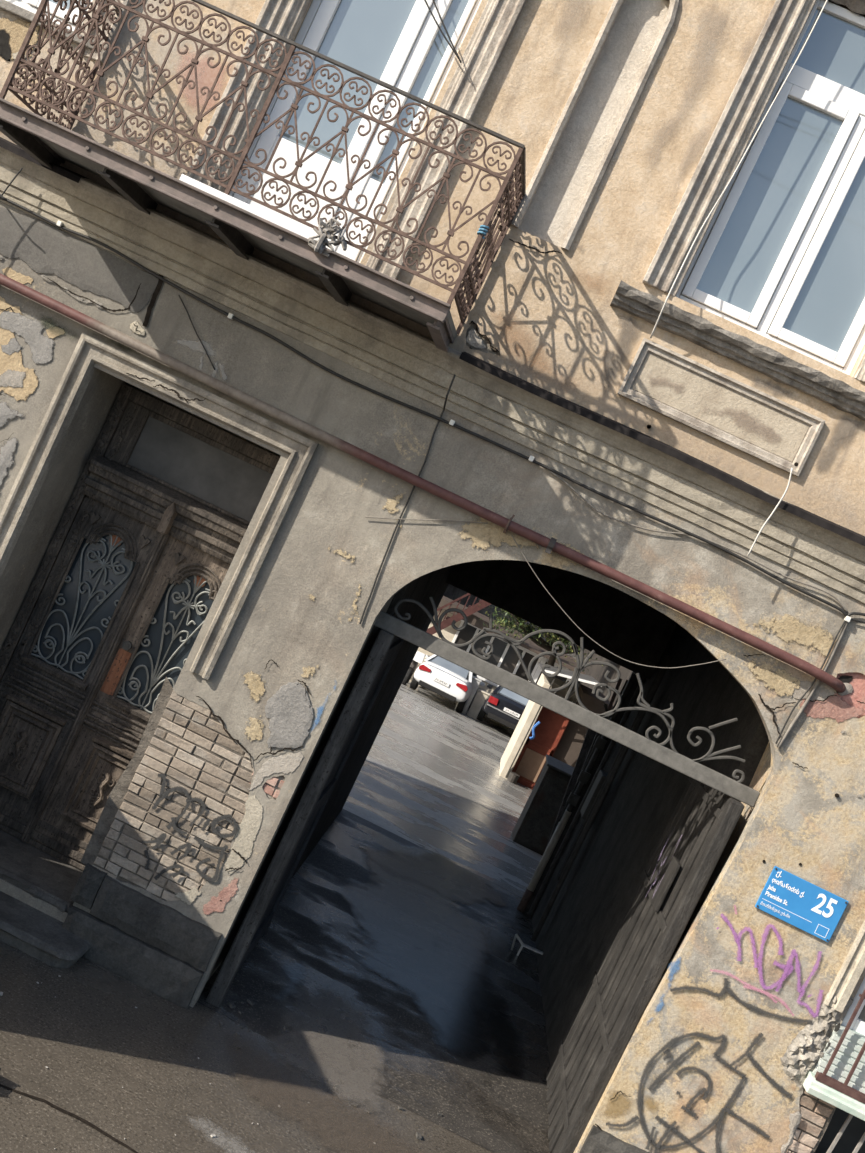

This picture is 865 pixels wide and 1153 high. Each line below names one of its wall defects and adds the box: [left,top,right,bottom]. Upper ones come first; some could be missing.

flaking render [0,296,65,401]
spalling [747,660,865,734]
spalling [81,665,319,915]